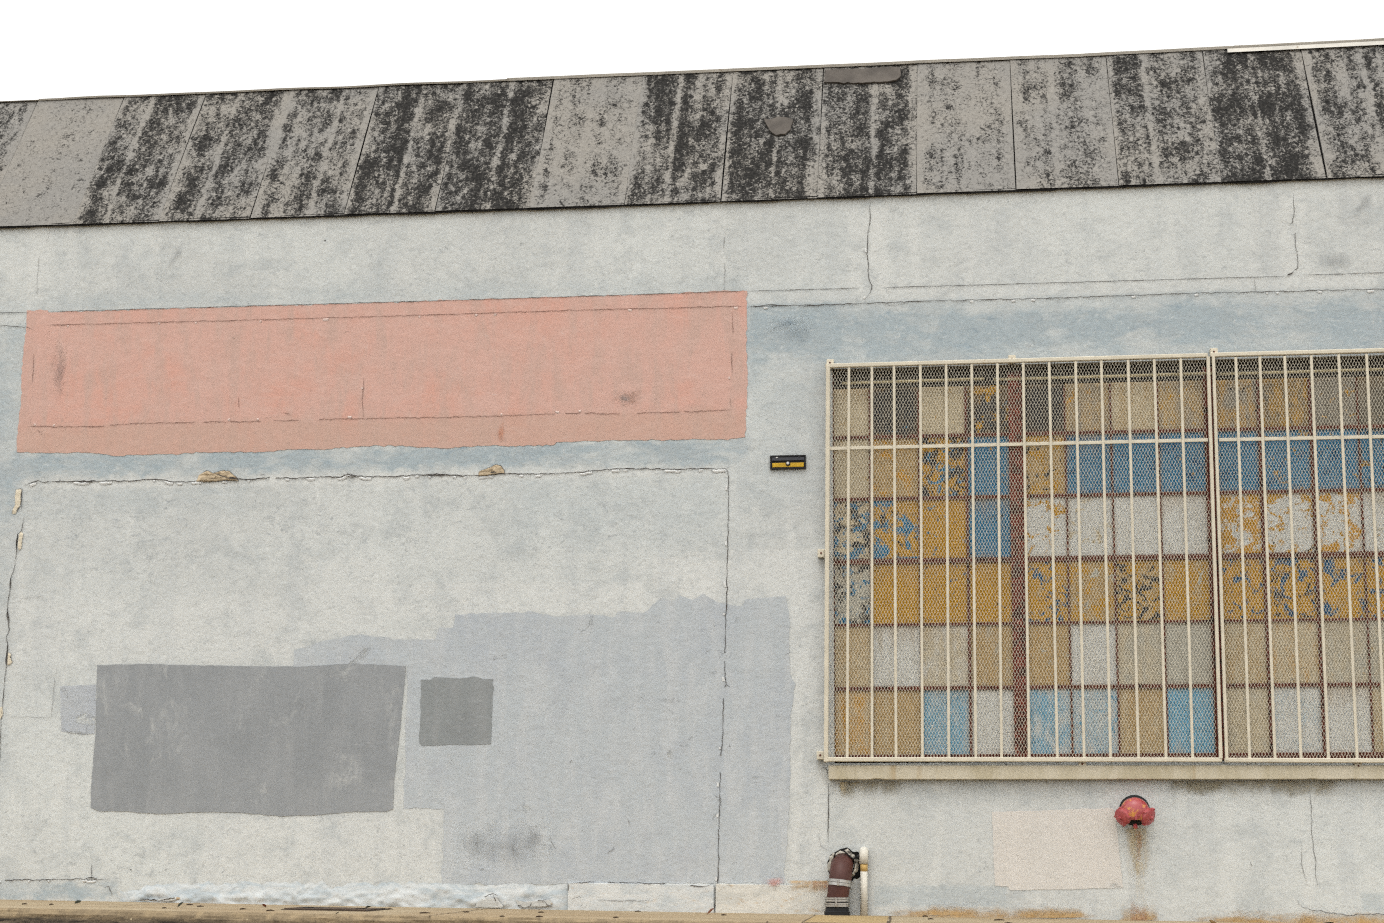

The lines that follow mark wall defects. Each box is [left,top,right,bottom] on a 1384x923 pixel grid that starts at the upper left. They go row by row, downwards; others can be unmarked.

crack [2,195,1384,377]
spalling [197,470,238,482]
spalling [478,464,505,476]